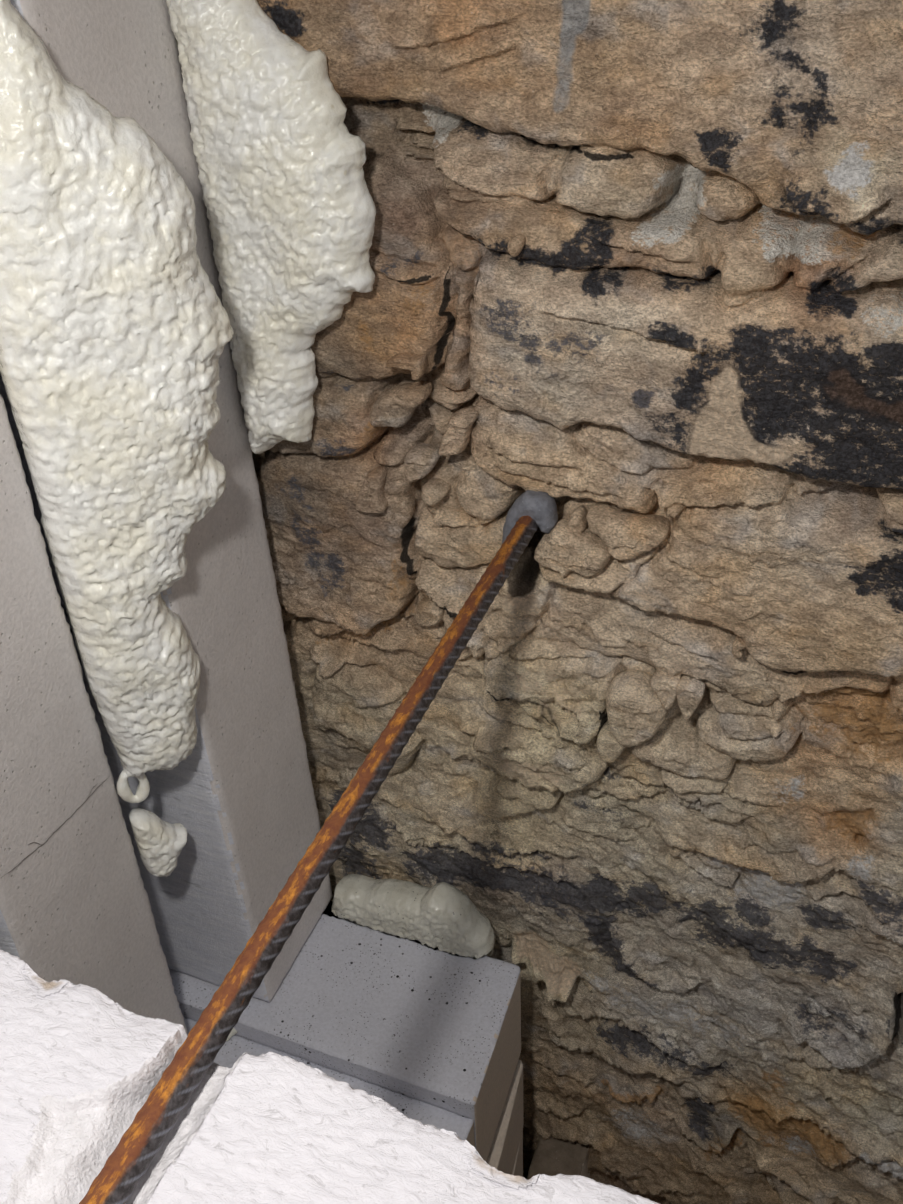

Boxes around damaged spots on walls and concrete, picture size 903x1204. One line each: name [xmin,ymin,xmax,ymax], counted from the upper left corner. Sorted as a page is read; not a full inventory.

leakage [690,0,903,260]
leakage [471,212,725,415]
leakage [628,264,903,635]
corrosion [308,534,420,655]